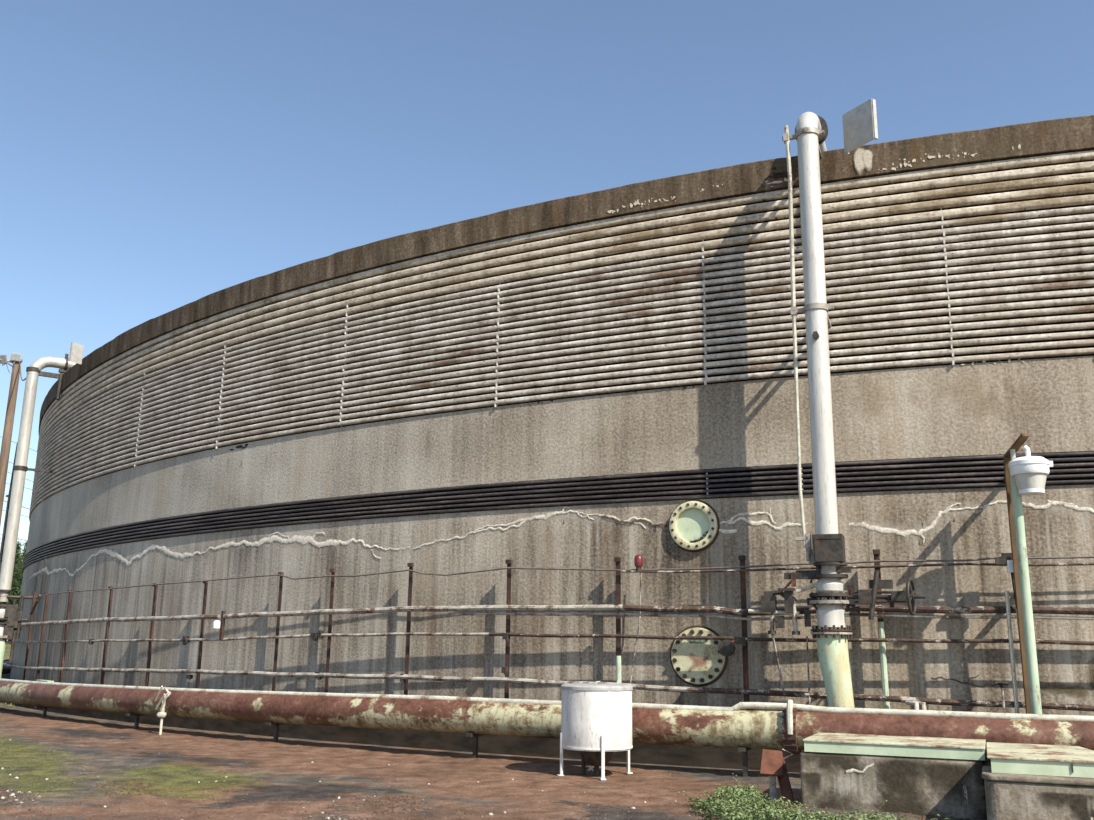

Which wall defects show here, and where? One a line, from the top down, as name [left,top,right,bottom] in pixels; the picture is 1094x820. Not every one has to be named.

spalling [878,152,977,171]
crack [719,508,807,534]
crack [849,500,1094,543]
crack [31,507,667,581]
leakage [1050,685,1085,695]